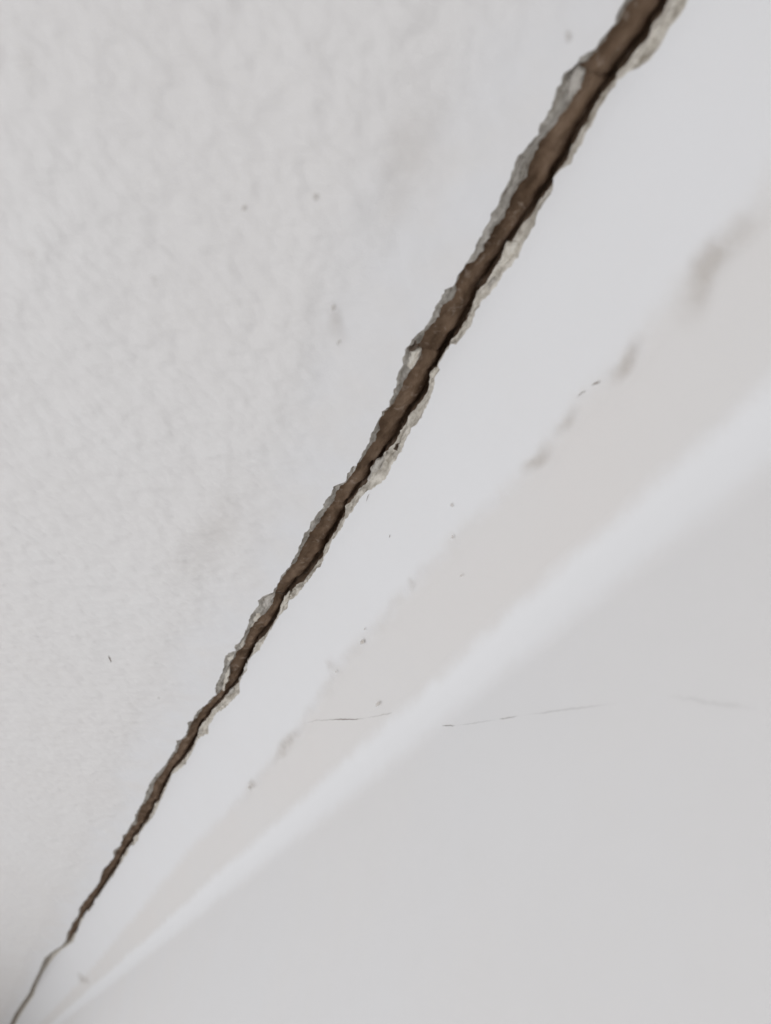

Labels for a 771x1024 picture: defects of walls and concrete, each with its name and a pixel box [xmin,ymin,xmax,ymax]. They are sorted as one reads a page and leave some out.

crack [62,0,687,947]
crack [10,931,77,1024]